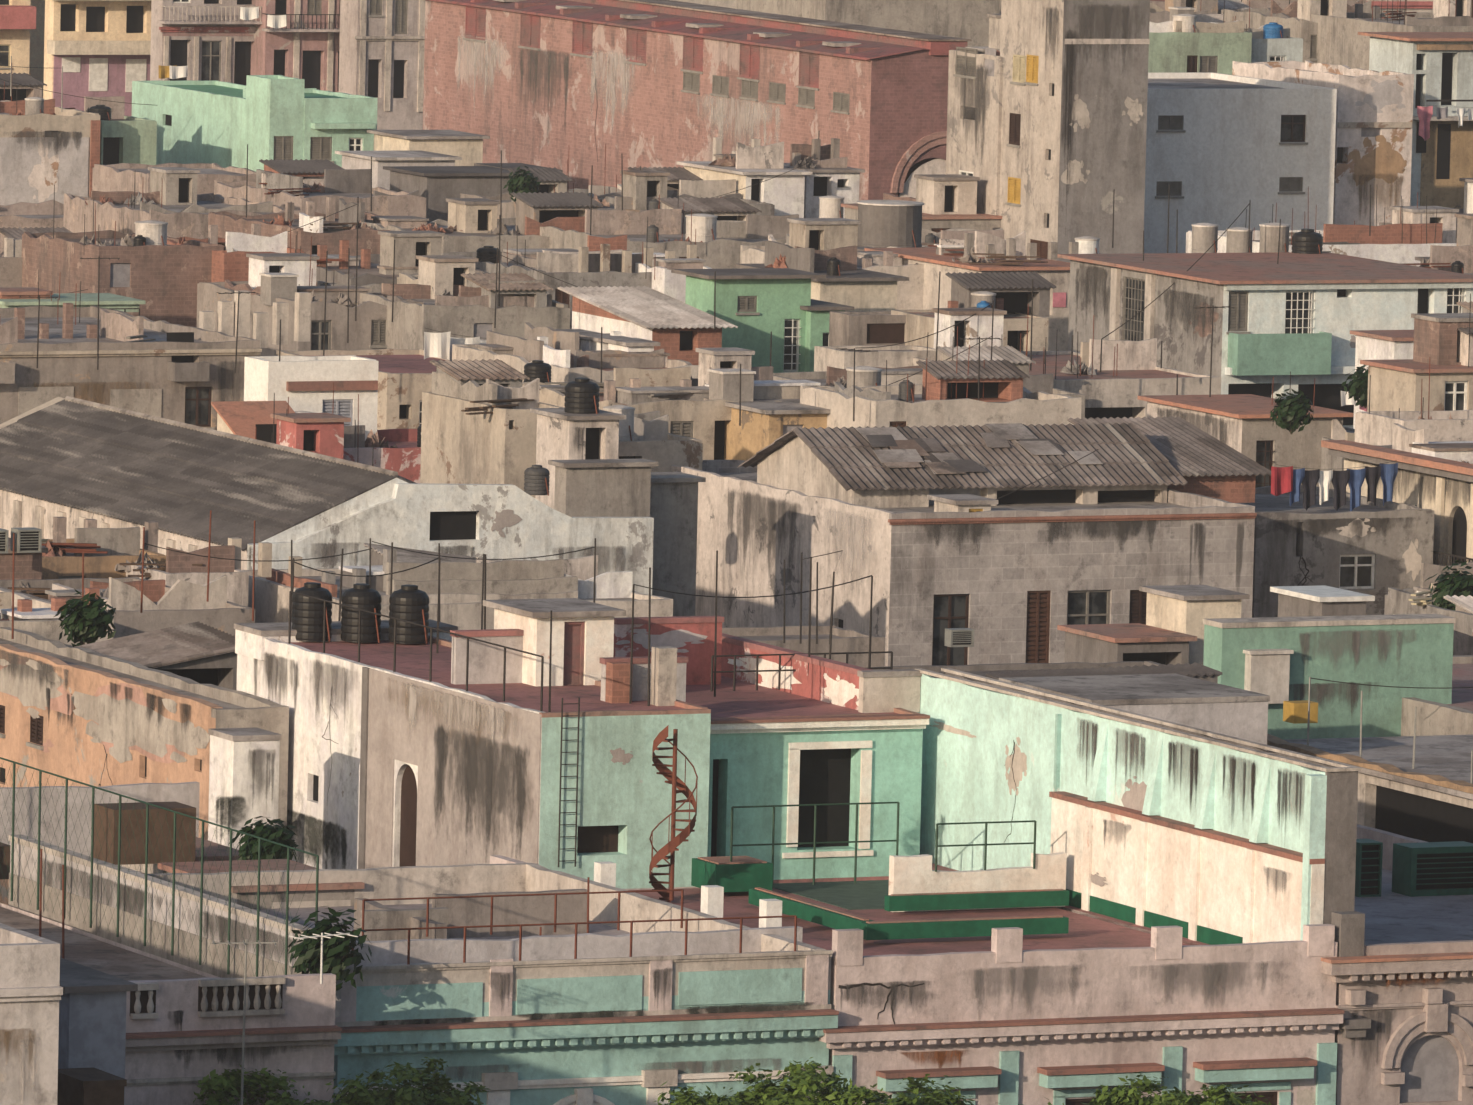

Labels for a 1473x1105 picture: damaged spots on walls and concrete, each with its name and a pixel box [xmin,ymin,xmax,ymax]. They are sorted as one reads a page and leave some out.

flaking render [0,658,210,763]
peeling [728,657,802,690]
peeling [823,673,859,706]
leakage [435,727,526,842]
peeling [1005,737,1027,795]
leakage [1080,722,1097,758]
leakage [1116,733,1144,775]
leakage [1168,743,1198,803]
leakage [1223,756,1255,804]
leakage [1277,770,1301,817]
crack [838,983,924,1024]